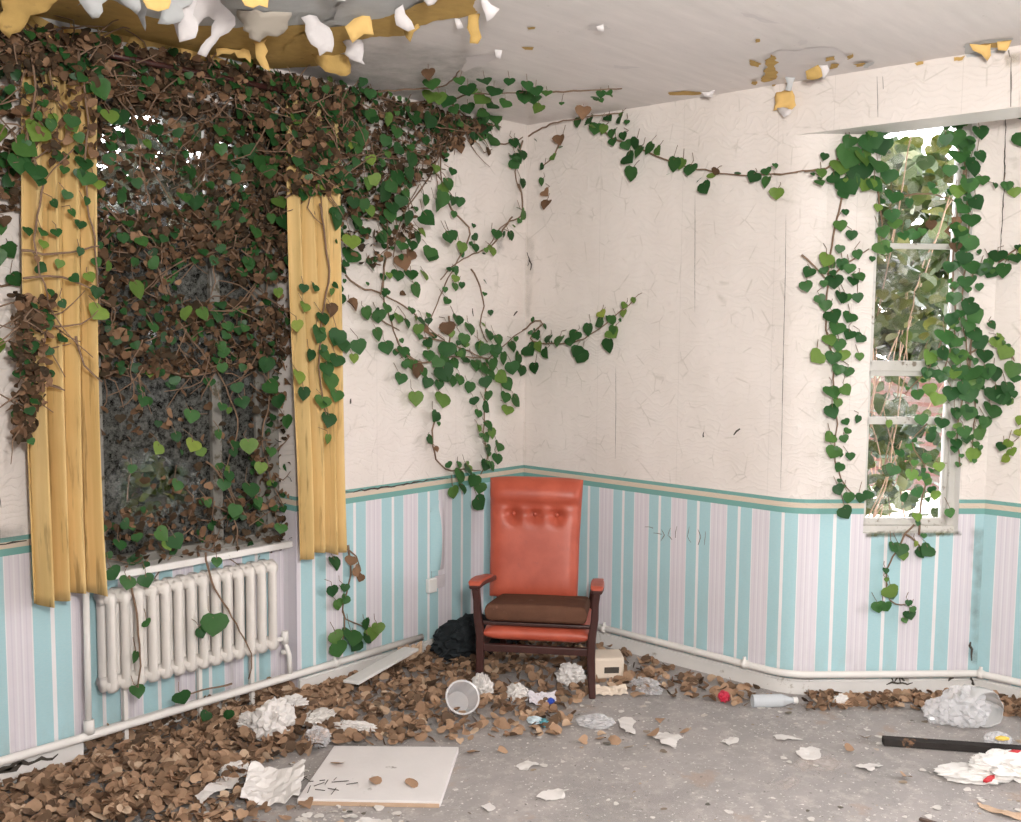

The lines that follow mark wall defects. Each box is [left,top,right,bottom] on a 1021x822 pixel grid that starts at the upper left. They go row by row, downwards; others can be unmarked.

peeling [0,0,502,76]
peeling [749,40,874,117]
peeling [954,38,1013,61]
crack [0,754,58,774]